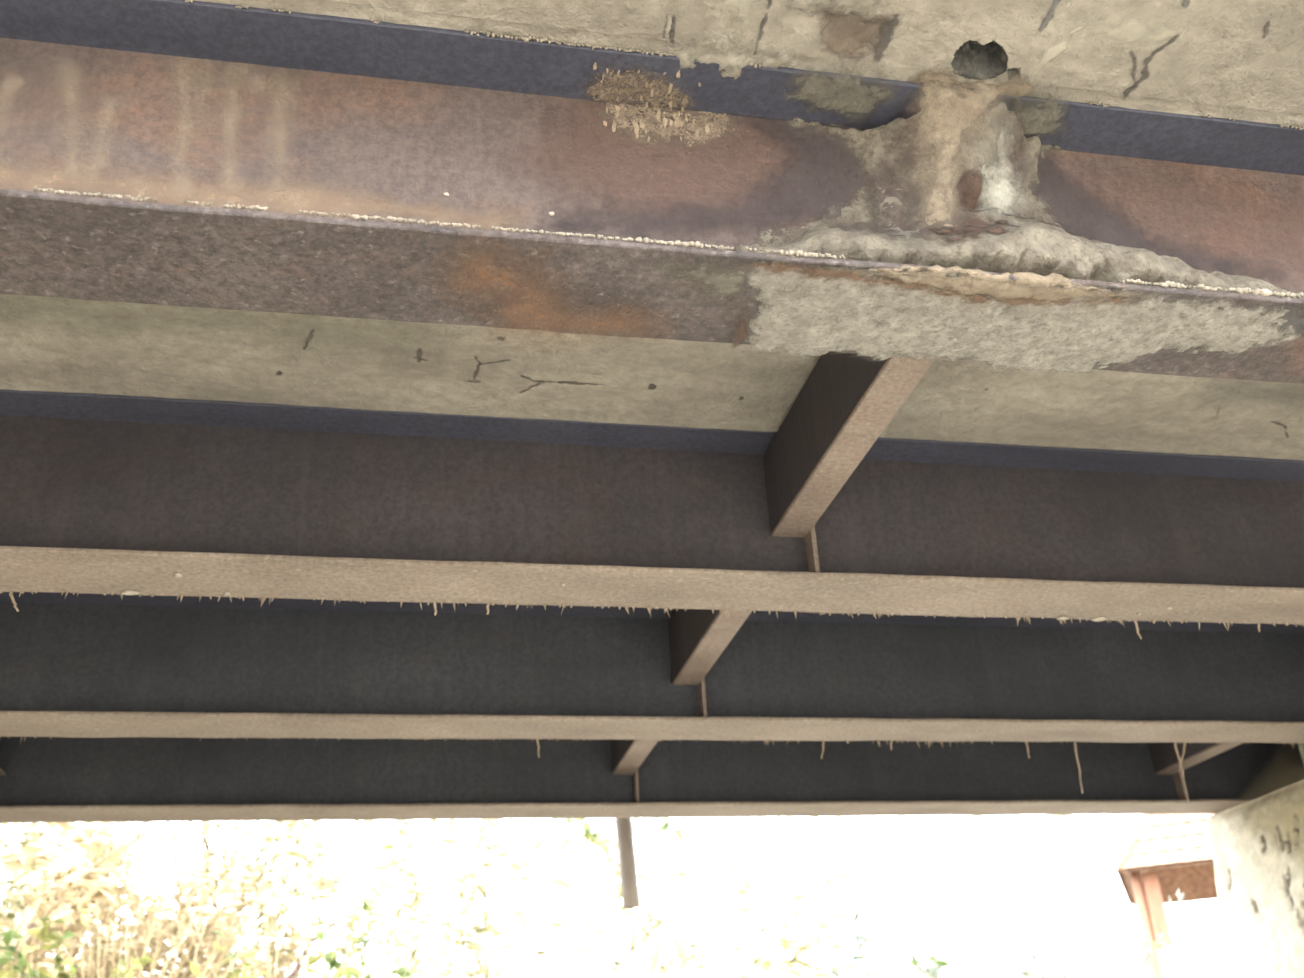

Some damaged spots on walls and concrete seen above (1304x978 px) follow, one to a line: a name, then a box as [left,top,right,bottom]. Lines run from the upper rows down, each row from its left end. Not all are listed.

spalling [950,40,1021,80]
crack [1123,0,1190,100]
rust [0,164,503,226]
spalling [953,170,983,212]